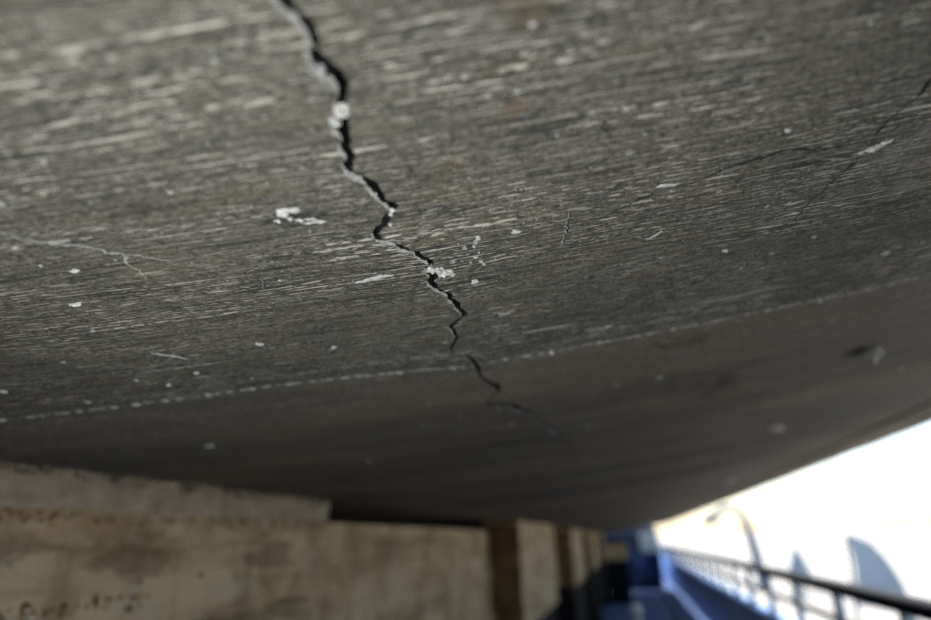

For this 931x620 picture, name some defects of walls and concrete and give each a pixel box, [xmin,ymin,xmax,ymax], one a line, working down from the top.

crack [271,0,562,436]
crack [561,211,571,248]
crack [690,79,931,225]